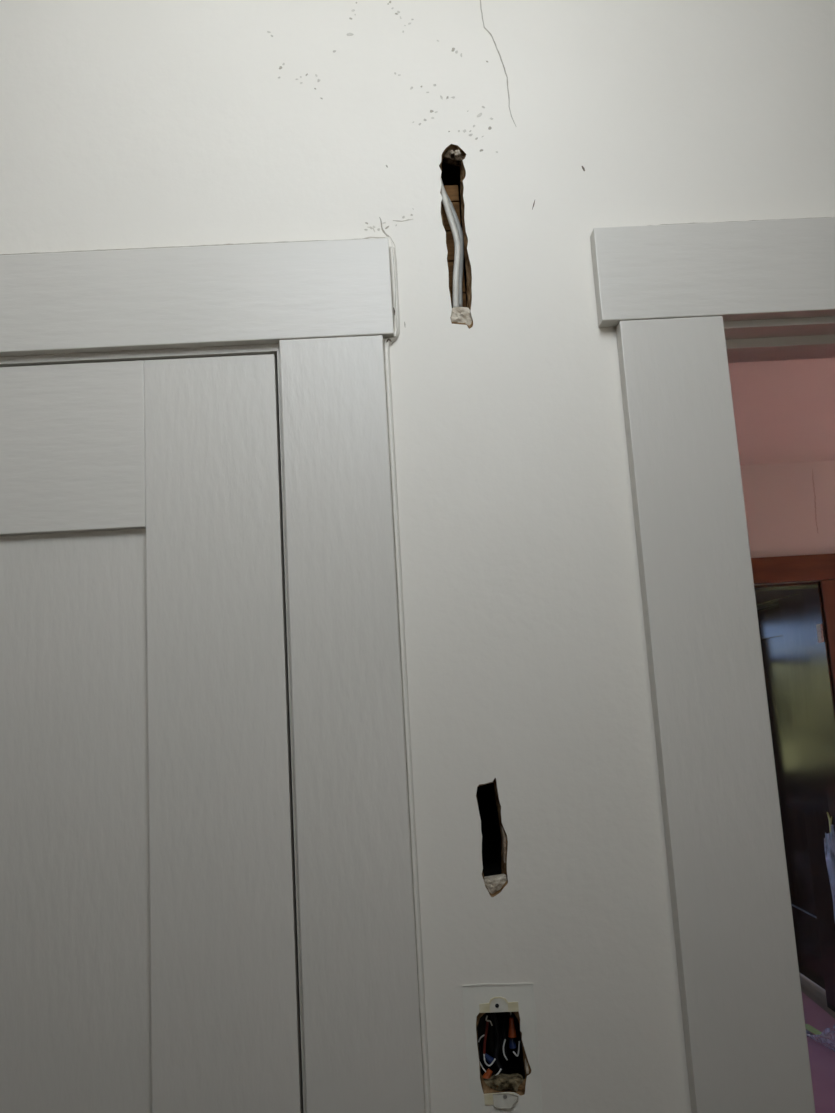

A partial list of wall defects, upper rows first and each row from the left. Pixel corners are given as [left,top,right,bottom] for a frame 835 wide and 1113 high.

crack [480,0,516,126]